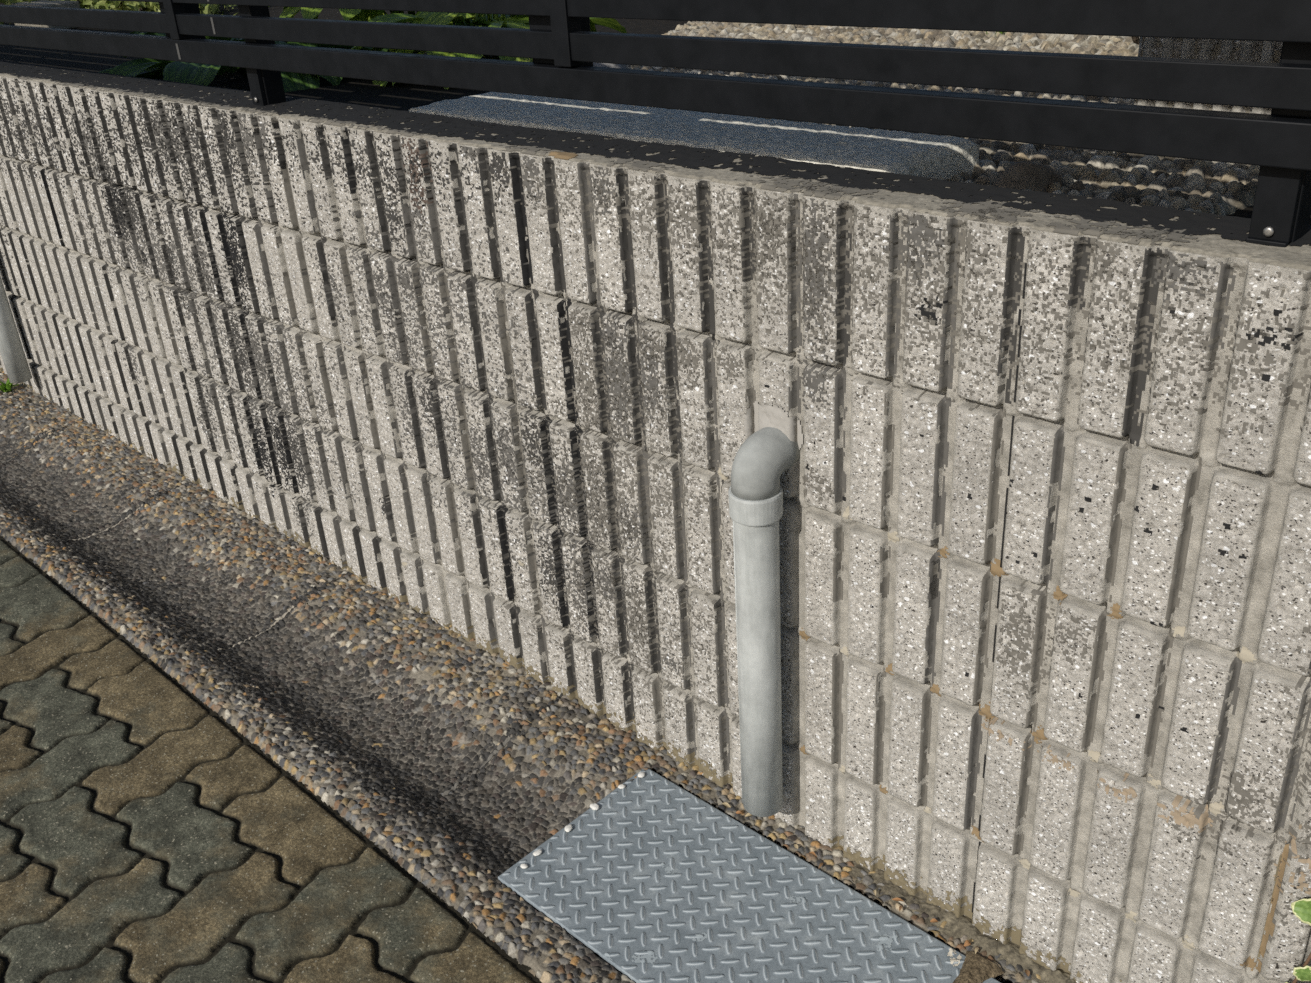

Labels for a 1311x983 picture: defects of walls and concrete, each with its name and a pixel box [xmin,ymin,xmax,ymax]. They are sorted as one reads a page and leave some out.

leakage [0,74,1311,830]
leakage [1012,702,1038,870]
leakage [1168,598,1311,954]